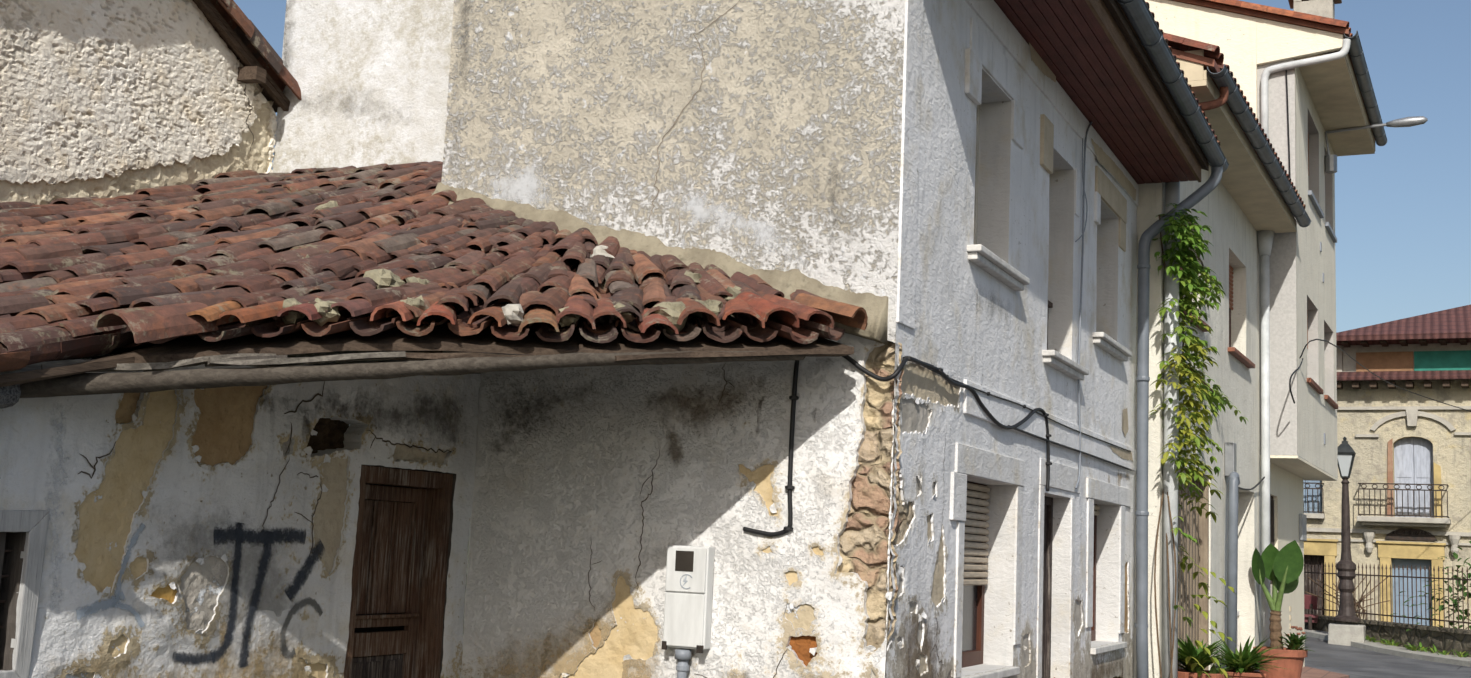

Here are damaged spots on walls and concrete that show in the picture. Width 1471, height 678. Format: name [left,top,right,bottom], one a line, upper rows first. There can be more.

crack [645,0,740,236]
peeling [74,385,268,593]
crack [635,450,660,594]
peeling [738,464,778,516]
spalling [812,341,960,678]
peeling [151,554,228,634]
crack [588,542,601,609]
peeling [560,576,658,678]
peeling [785,571,817,666]